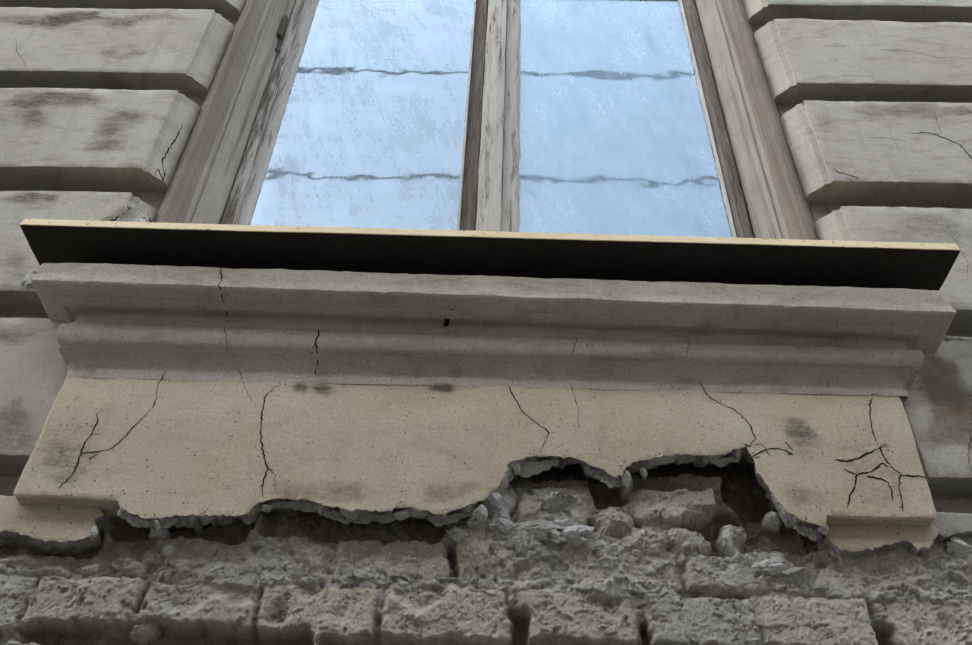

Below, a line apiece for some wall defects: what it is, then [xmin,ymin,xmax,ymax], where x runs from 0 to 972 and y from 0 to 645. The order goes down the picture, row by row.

crack [872,113,972,159]
spalling [115,202,150,222]
crack [218,268,282,497]
crack [58,370,167,489]
crack [507,383,555,451]
spalling [508,460,559,482]
spalling [583,466,648,488]
crack [700,382,793,461]
crack [835,393,927,511]
spalling [117,508,197,530]
spalling [251,492,502,527]
spalling [778,505,829,541]